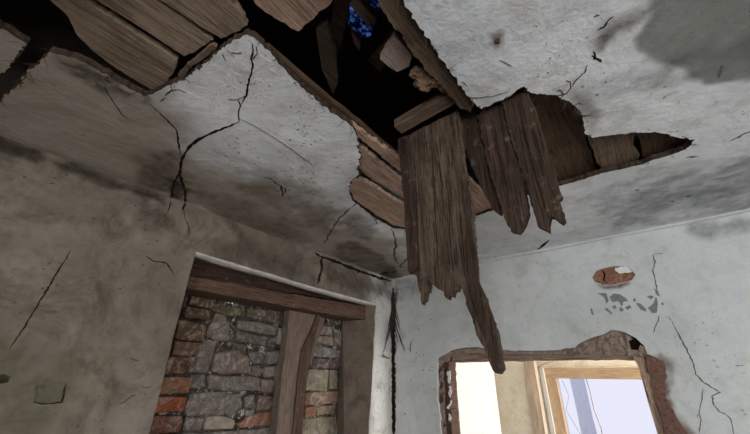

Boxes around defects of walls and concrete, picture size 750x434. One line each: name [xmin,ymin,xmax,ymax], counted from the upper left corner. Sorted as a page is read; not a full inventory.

water stain [639,0,750,83]
crack [150,43,311,234]
crack [9,250,71,349]
crack [315,203,407,311]
spalling [592,266,664,315]
crack [382,329,412,434]
spalling [439,348,487,434]
spalling [503,331,688,434]
crack [653,315,734,434]